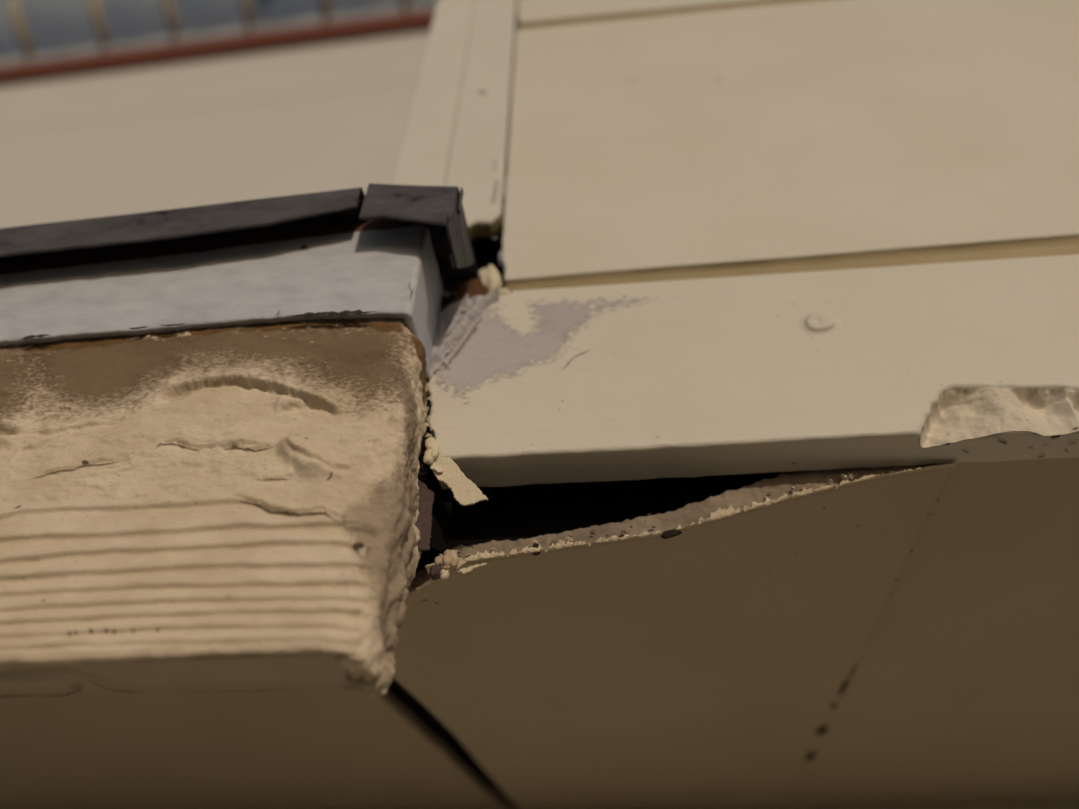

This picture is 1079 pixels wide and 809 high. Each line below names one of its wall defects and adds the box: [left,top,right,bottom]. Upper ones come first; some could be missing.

crack [417,378,453,551]
spalling [920,386,1079,448]